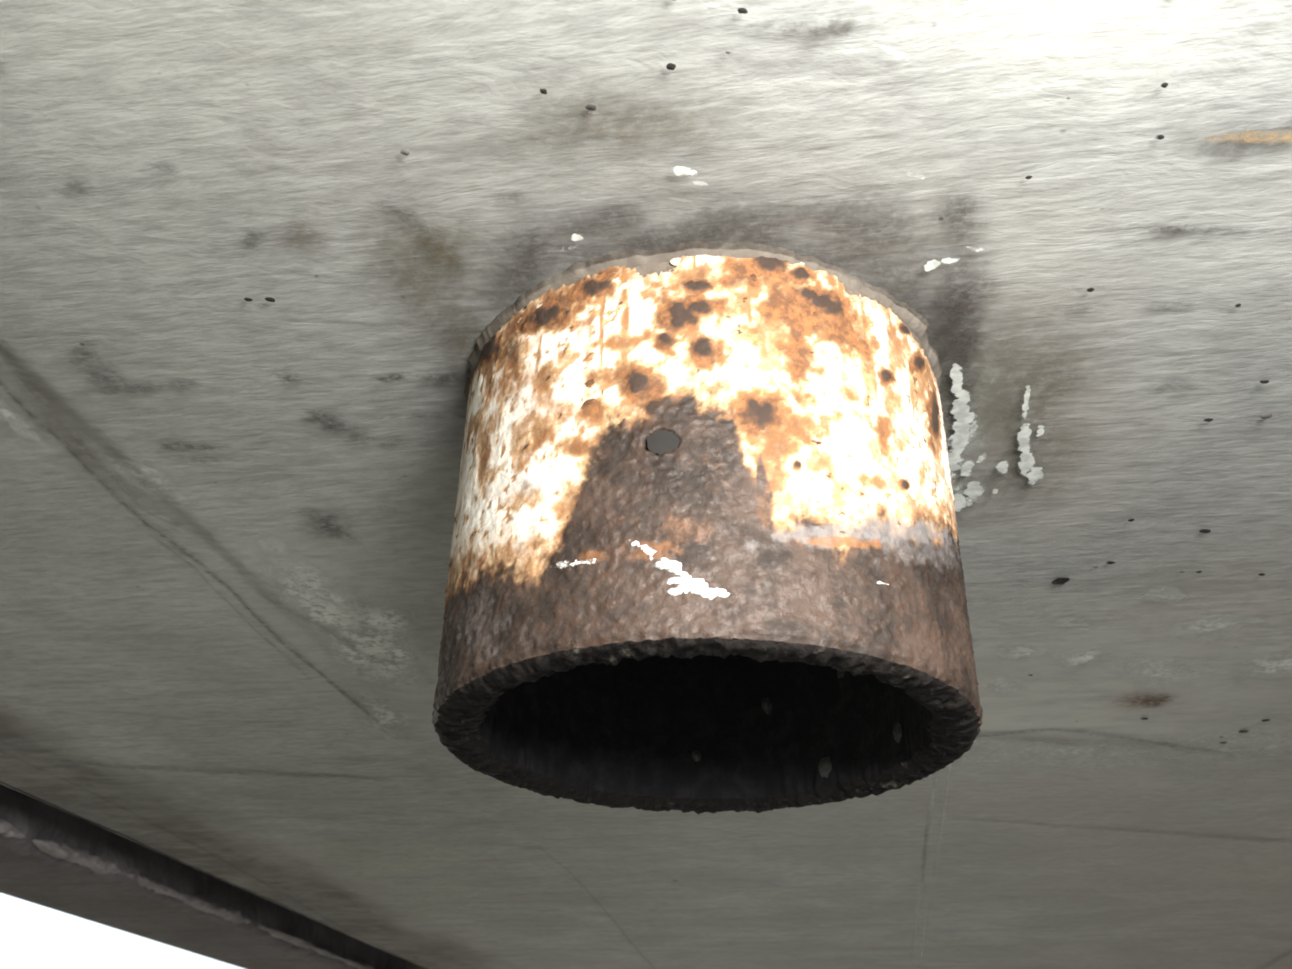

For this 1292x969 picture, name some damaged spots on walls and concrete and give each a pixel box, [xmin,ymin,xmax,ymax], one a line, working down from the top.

damp [584,216,708,263]
damp [896,277,982,376]